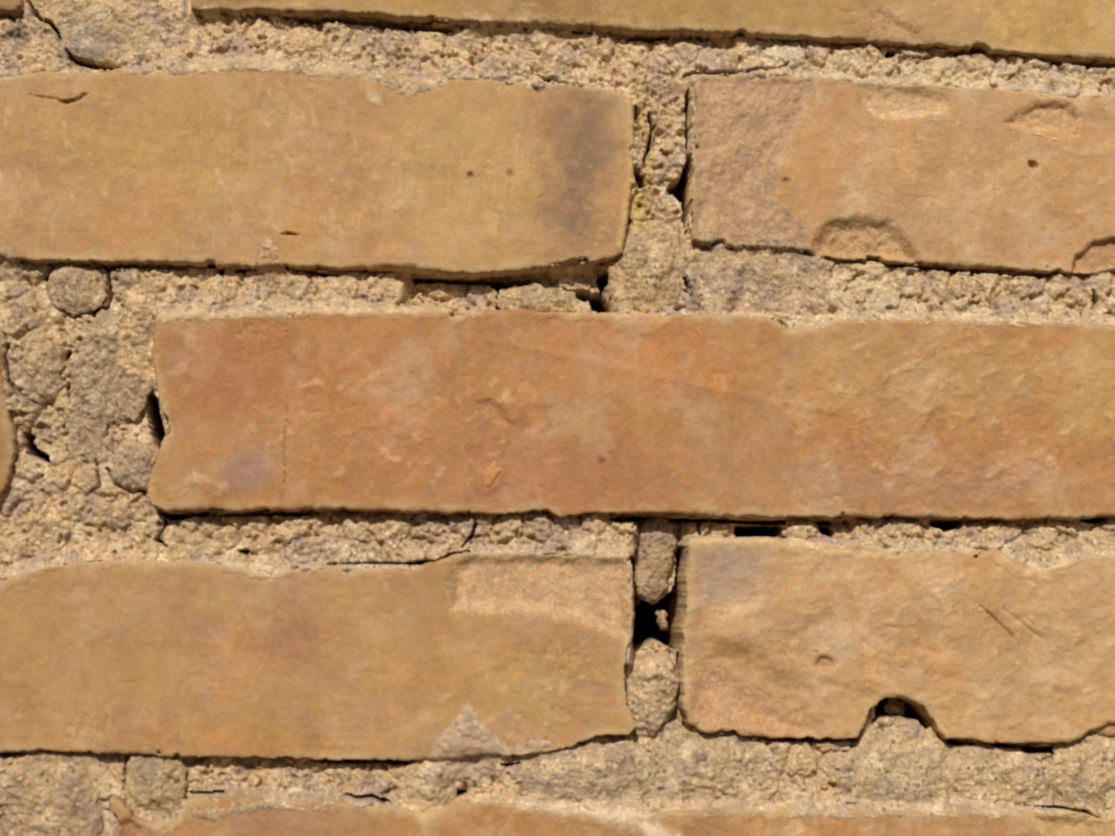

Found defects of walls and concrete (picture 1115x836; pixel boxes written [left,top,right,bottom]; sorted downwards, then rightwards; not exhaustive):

crack [26,0,122,106]
crack [2,340,41,405]
crack [89,458,155,494]
crack [326,521,478,566]
spalling [869,698,914,728]
peeling [511,737,561,763]
spalling [947,740,1018,749]